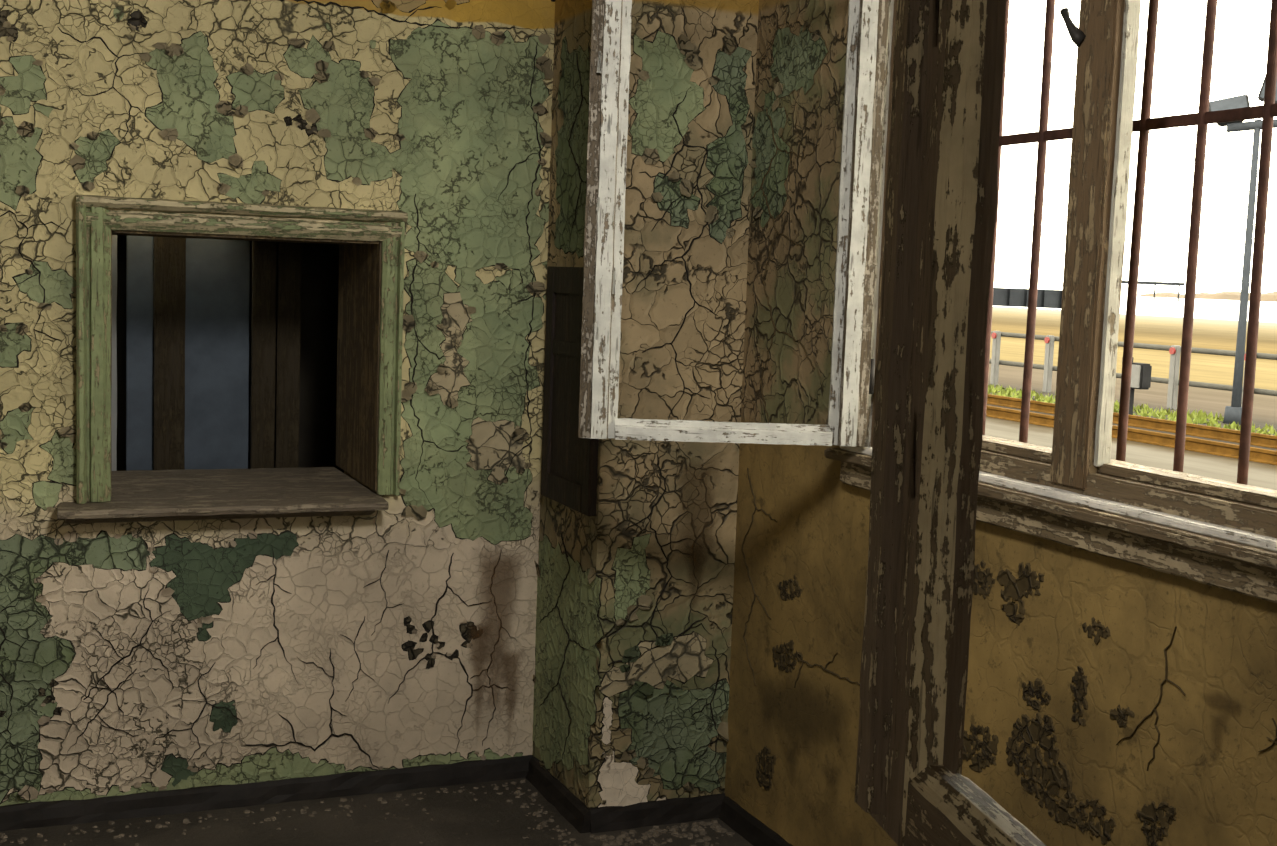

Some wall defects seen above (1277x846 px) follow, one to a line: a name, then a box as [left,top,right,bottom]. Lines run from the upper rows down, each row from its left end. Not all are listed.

peeling [0,0,730,808]
crack [632,92,718,420]
crack [750,109,818,423]
crack [67,454,777,770]
crack [1116,627,1186,771]
crack [1258,718,1277,752]